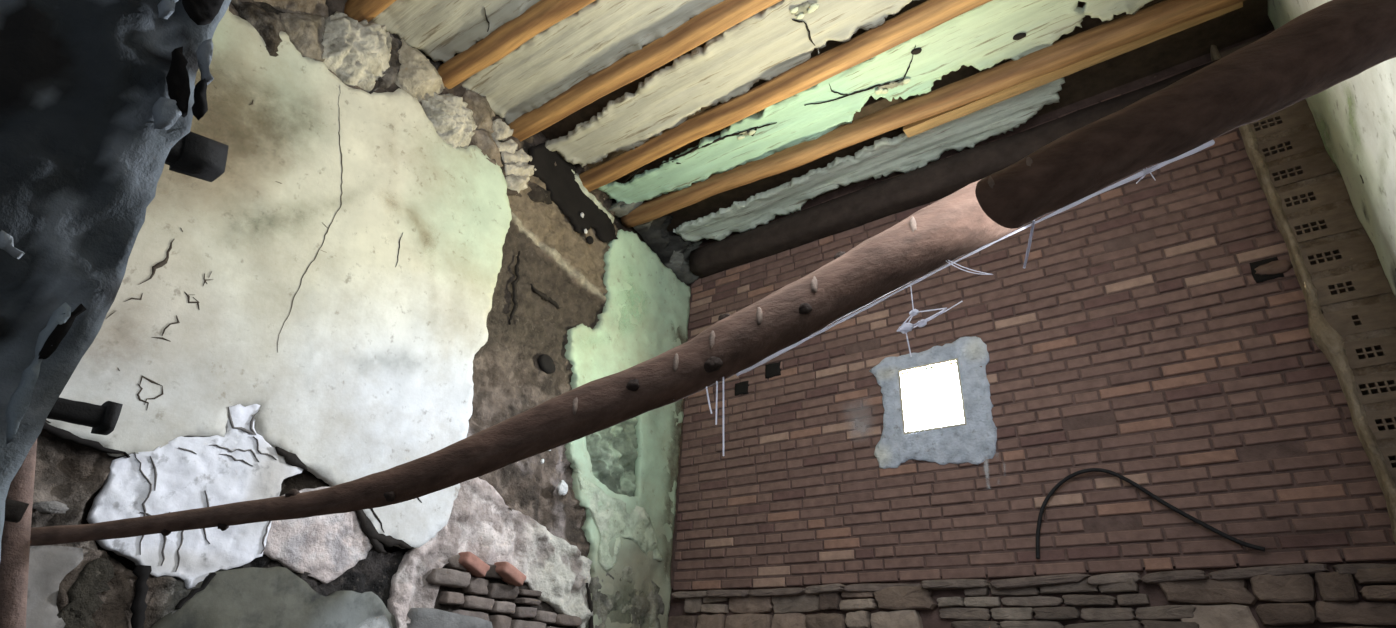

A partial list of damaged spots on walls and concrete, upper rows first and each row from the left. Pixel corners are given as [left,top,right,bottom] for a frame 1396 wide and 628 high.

peeling [790,1,819,19]
peeling [875,79,911,95]
crack [277,92,343,351]
spalling [152,0,703,438]
peeling [31,404,664,628]